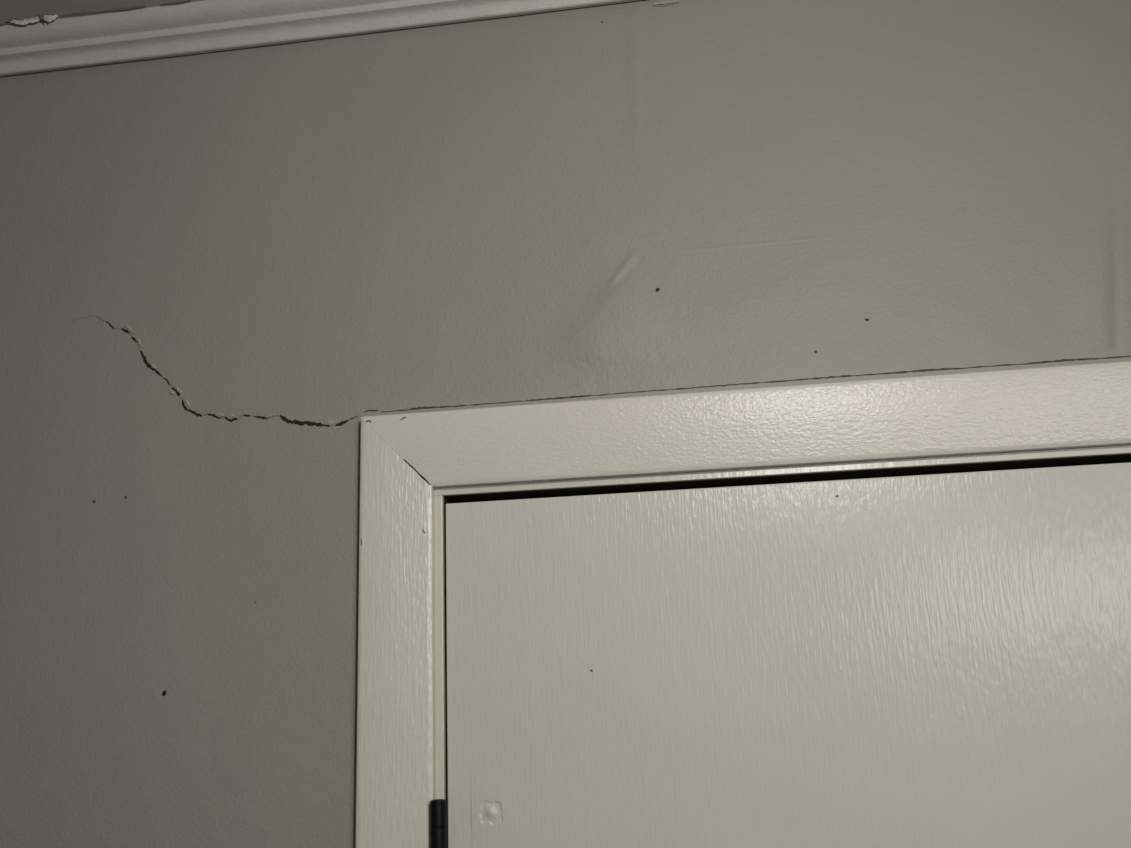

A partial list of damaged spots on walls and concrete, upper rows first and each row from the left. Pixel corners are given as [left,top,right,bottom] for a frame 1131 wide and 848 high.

peeling [5,15,58,25]
crack [71,315,1131,485]